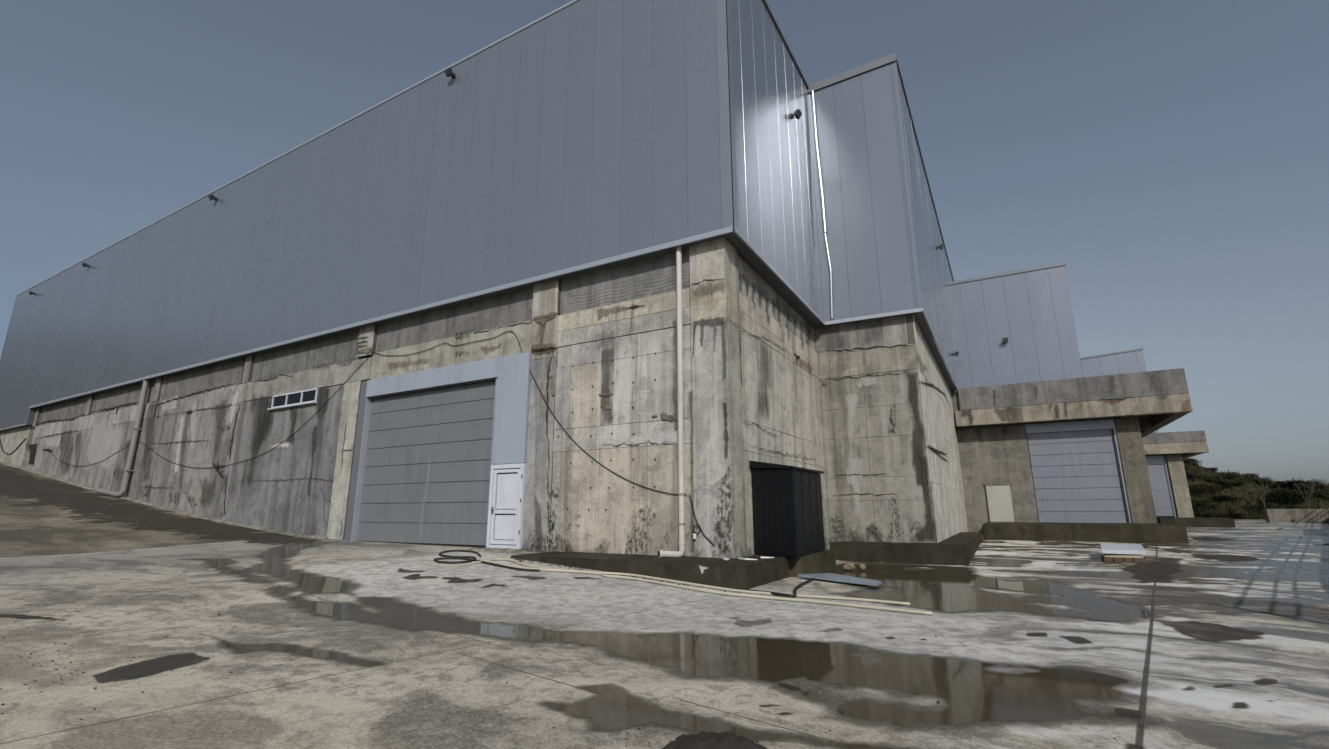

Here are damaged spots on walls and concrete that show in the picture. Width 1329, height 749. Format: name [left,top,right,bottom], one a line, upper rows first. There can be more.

leakage [694,318,724,328]
leakage [162,397,197,473]
leakage [714,403,734,553]
leakage [866,373,936,541]